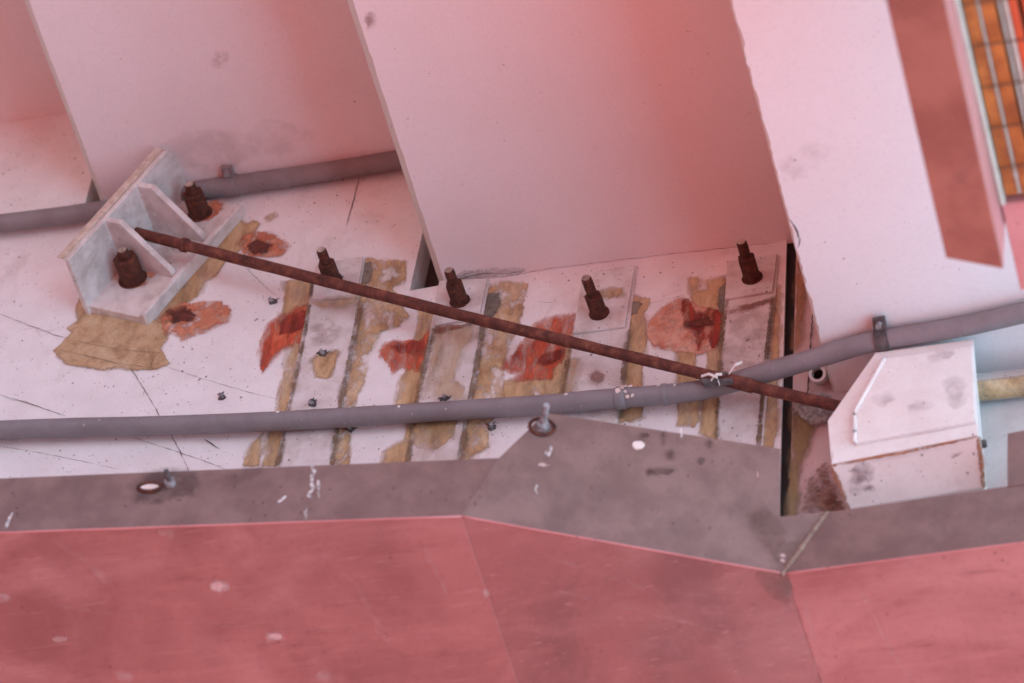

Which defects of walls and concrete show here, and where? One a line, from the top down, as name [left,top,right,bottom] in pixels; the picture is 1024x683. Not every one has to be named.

rust [241,231,288,257]
peeling [457,268,525,280]
rust [161,301,231,340]
rust [260,306,308,372]
rust [378,323,472,372]
rust [504,314,575,380]
rust [646,298,723,354]
crack [1,314,259,469]
rust [801,436,976,513]